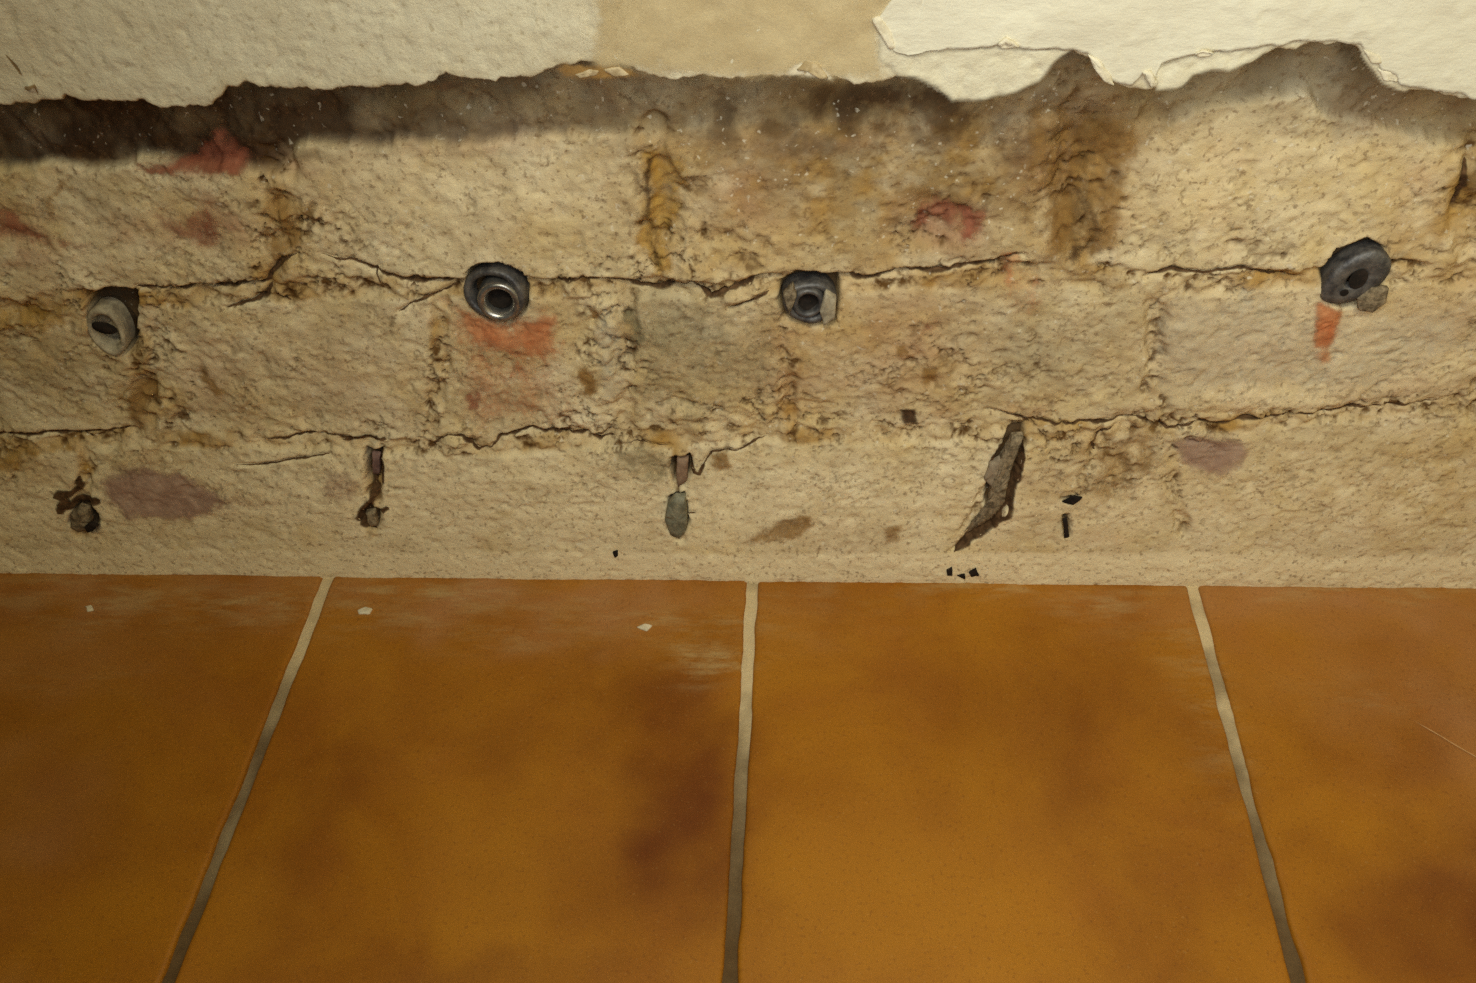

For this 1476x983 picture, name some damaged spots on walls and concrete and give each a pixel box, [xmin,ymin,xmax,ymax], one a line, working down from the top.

crack [138,253,459,310]
crack [558,275,769,306]
flaking render [0,16,1476,589]
crack [849,253,1018,279]
crack [1146,265,1294,275]
rust [1315,304,1341,361]
crack [0,425,131,436]
crack [235,431,351,465]
crack [429,425,671,450]
crack [700,436,764,470]
crack [990,398,1442,449]